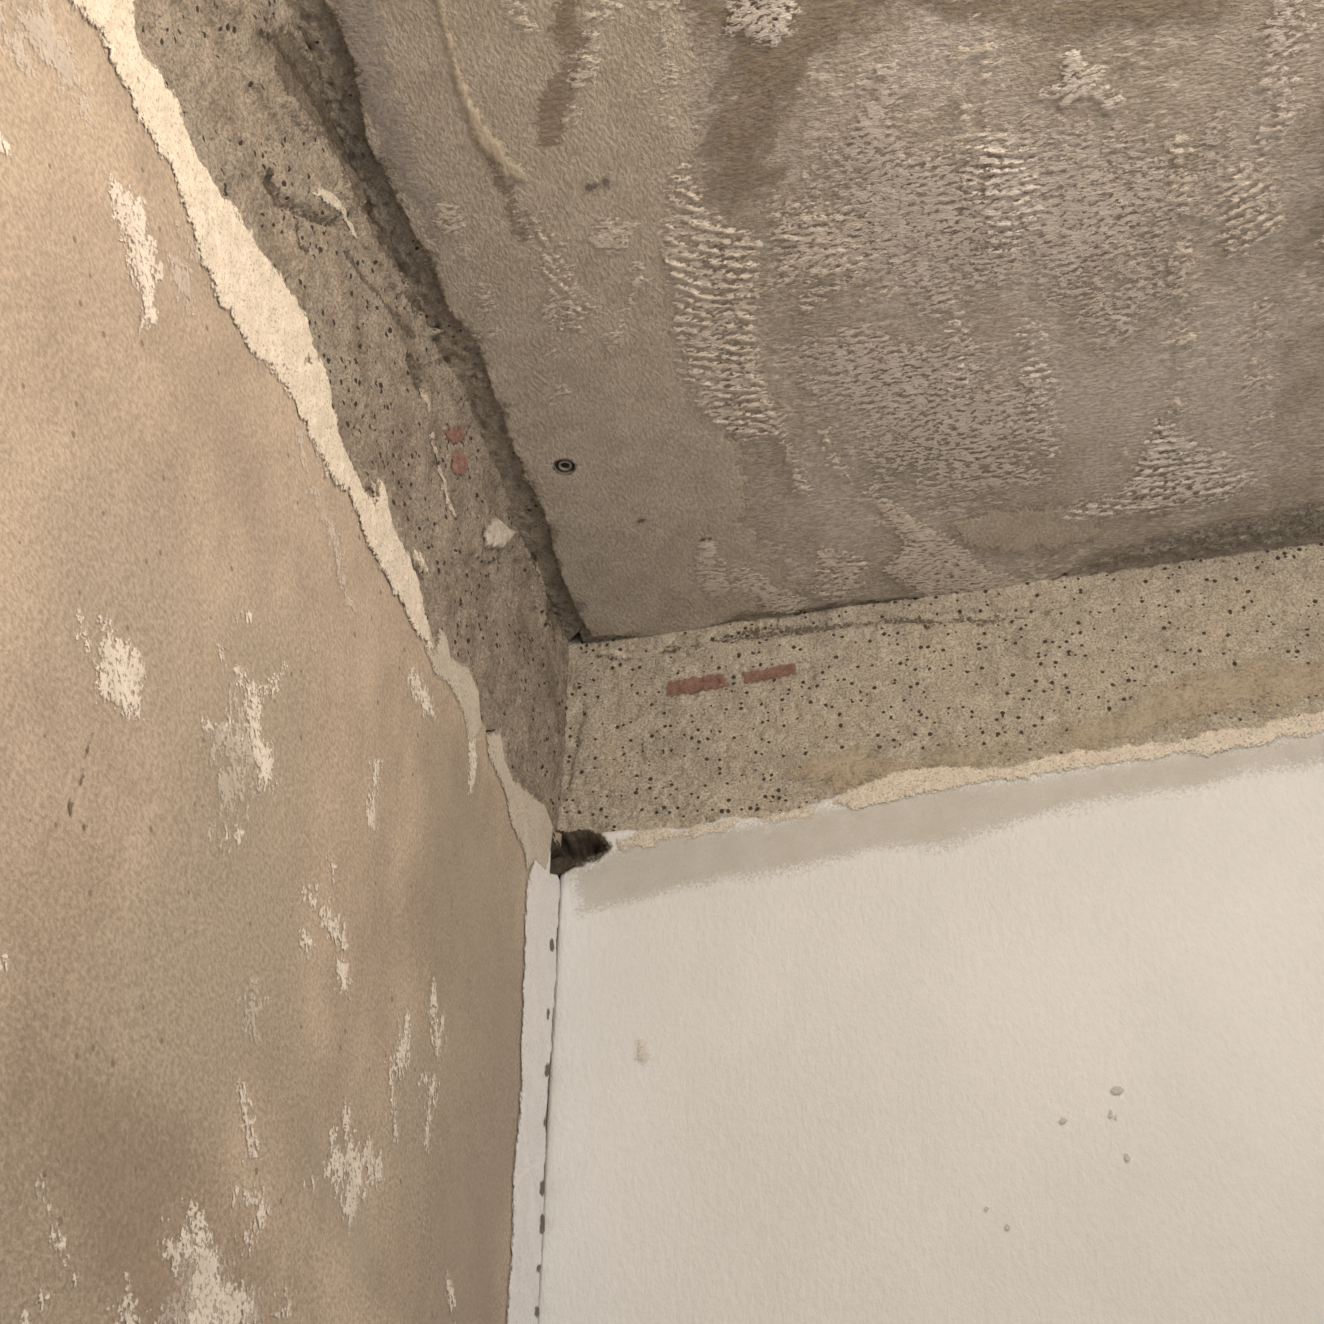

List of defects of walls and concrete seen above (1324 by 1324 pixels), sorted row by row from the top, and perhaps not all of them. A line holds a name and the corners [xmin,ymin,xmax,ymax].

flaking render [72,0,1324,884]